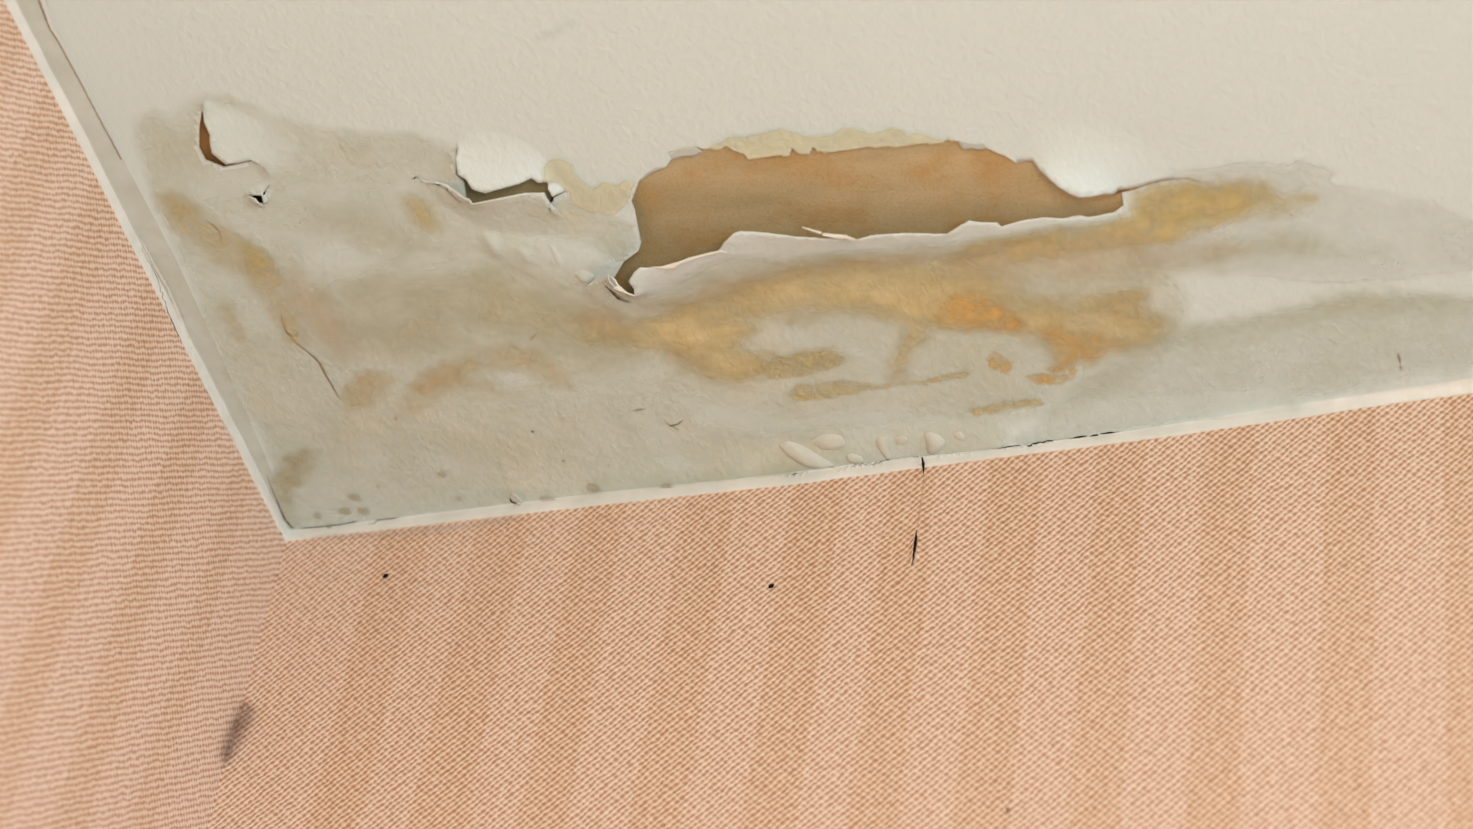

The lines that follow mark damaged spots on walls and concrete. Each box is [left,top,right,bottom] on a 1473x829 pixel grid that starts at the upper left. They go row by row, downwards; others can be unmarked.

peeling [199,98,278,179]
peeling [412,132,566,234]
damp [515,159,634,248]
damp [710,128,952,160]
peeling [581,122,1213,322]
damp [221,185,1273,508]